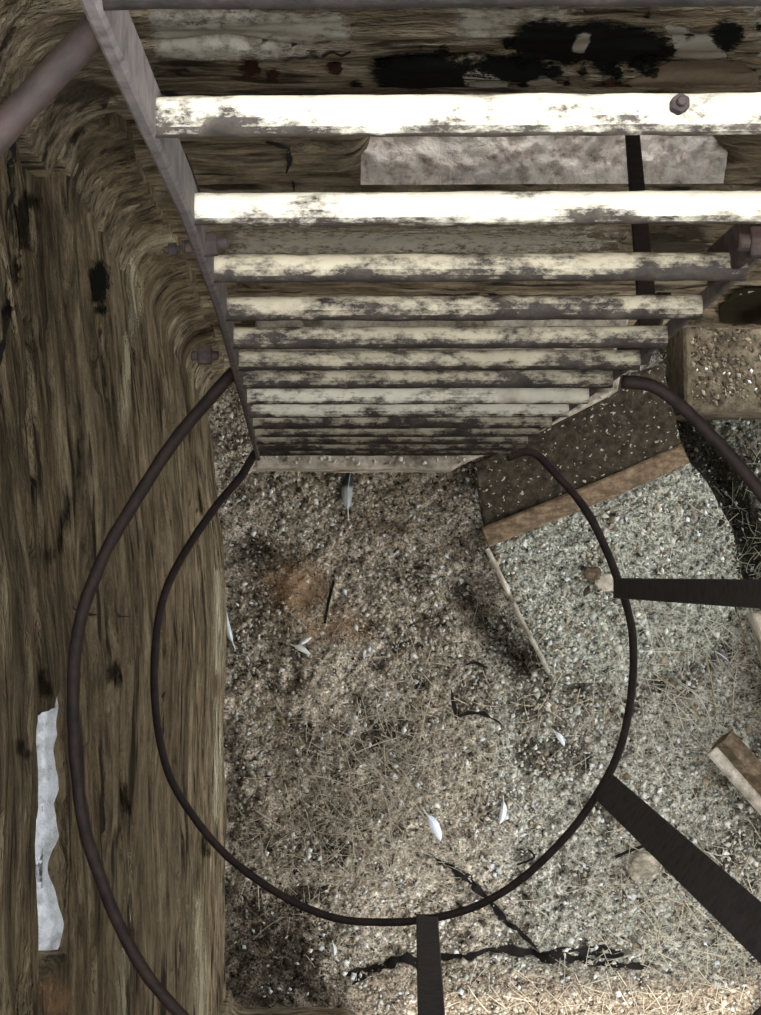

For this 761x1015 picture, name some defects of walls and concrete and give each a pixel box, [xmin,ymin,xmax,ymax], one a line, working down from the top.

leakage [349,11,693,89]
leakage [710,18,746,53]
rust [238,60,281,82]
rust [326,62,343,75]